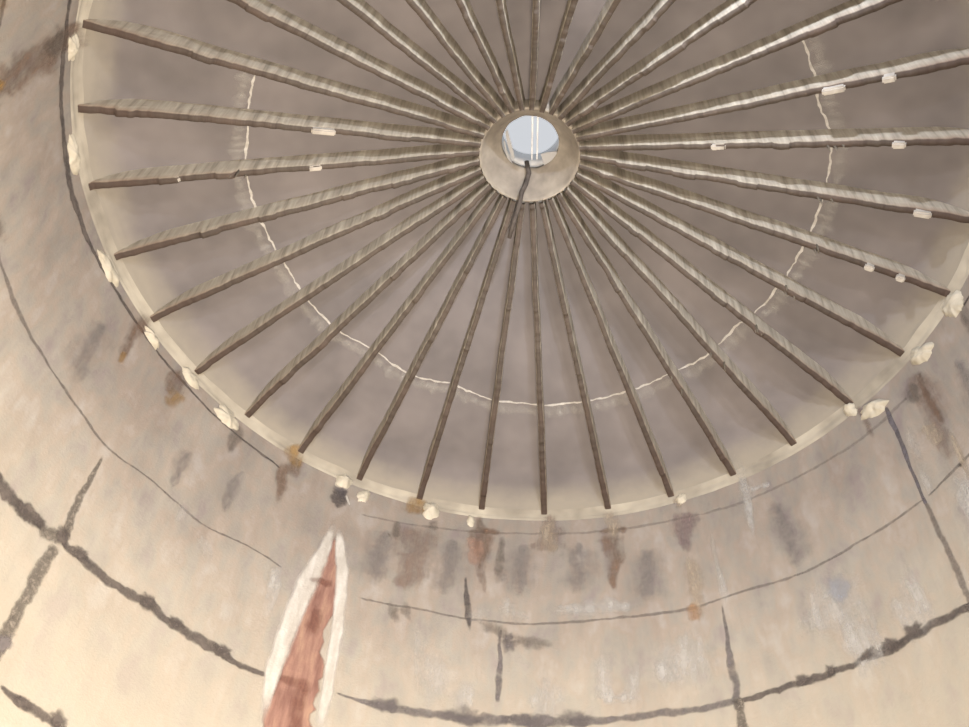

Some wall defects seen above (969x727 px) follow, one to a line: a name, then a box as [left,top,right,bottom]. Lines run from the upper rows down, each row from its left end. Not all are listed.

crack [244,40,833,406]
crack [895,454,969,520]
crack [1,686,65,727]
crack [62,542,265,676]
crack [338,603,969,727]